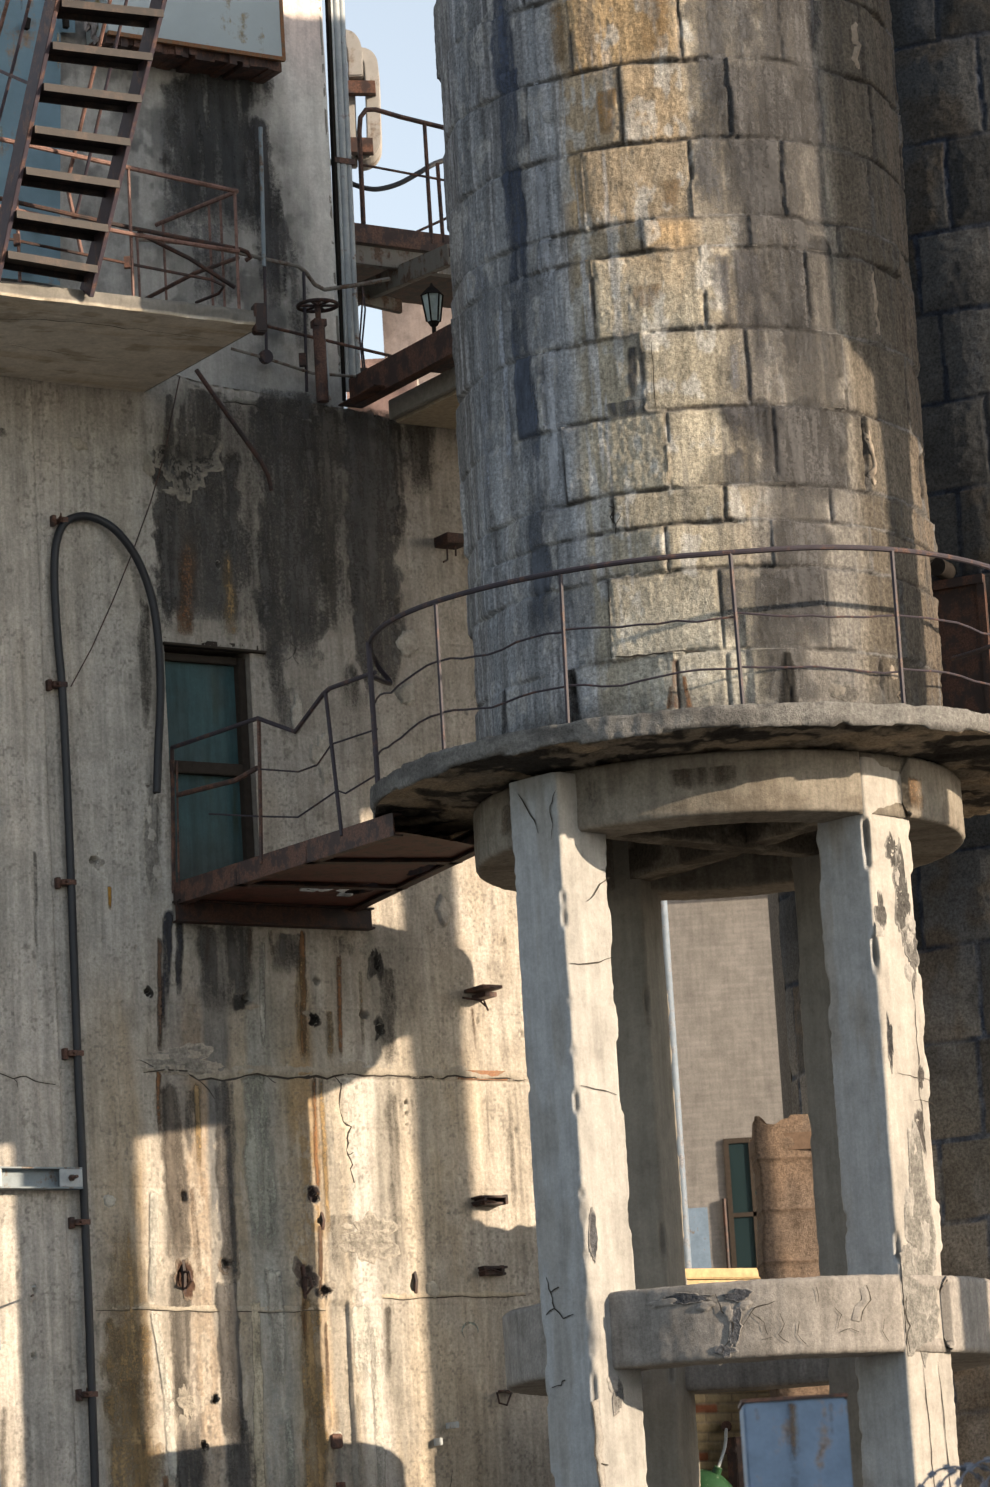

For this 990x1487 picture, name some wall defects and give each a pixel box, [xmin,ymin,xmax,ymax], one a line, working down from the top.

damp [685,0,850,703]
damp [138,389,434,724]
rust [295,931,308,1054]
crack [518,792,555,836]
spalling [874,830,920,999]
crack [140,1060,526,1185]
rust [100,1232,168,1487]
rust [300,1078,330,1487]
crack [382,1278,573,1319]
crack [715,1285,951,1487]